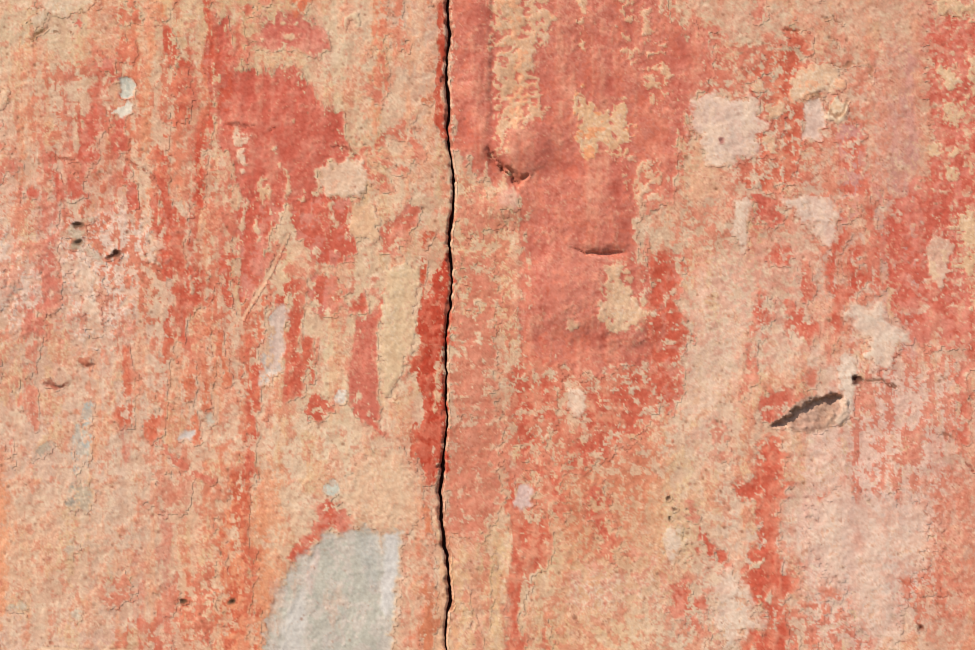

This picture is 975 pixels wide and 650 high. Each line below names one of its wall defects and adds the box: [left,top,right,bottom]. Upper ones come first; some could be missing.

crack [435,0,459,650]
spalling [260,478,408,650]
peeling [683,348,851,650]